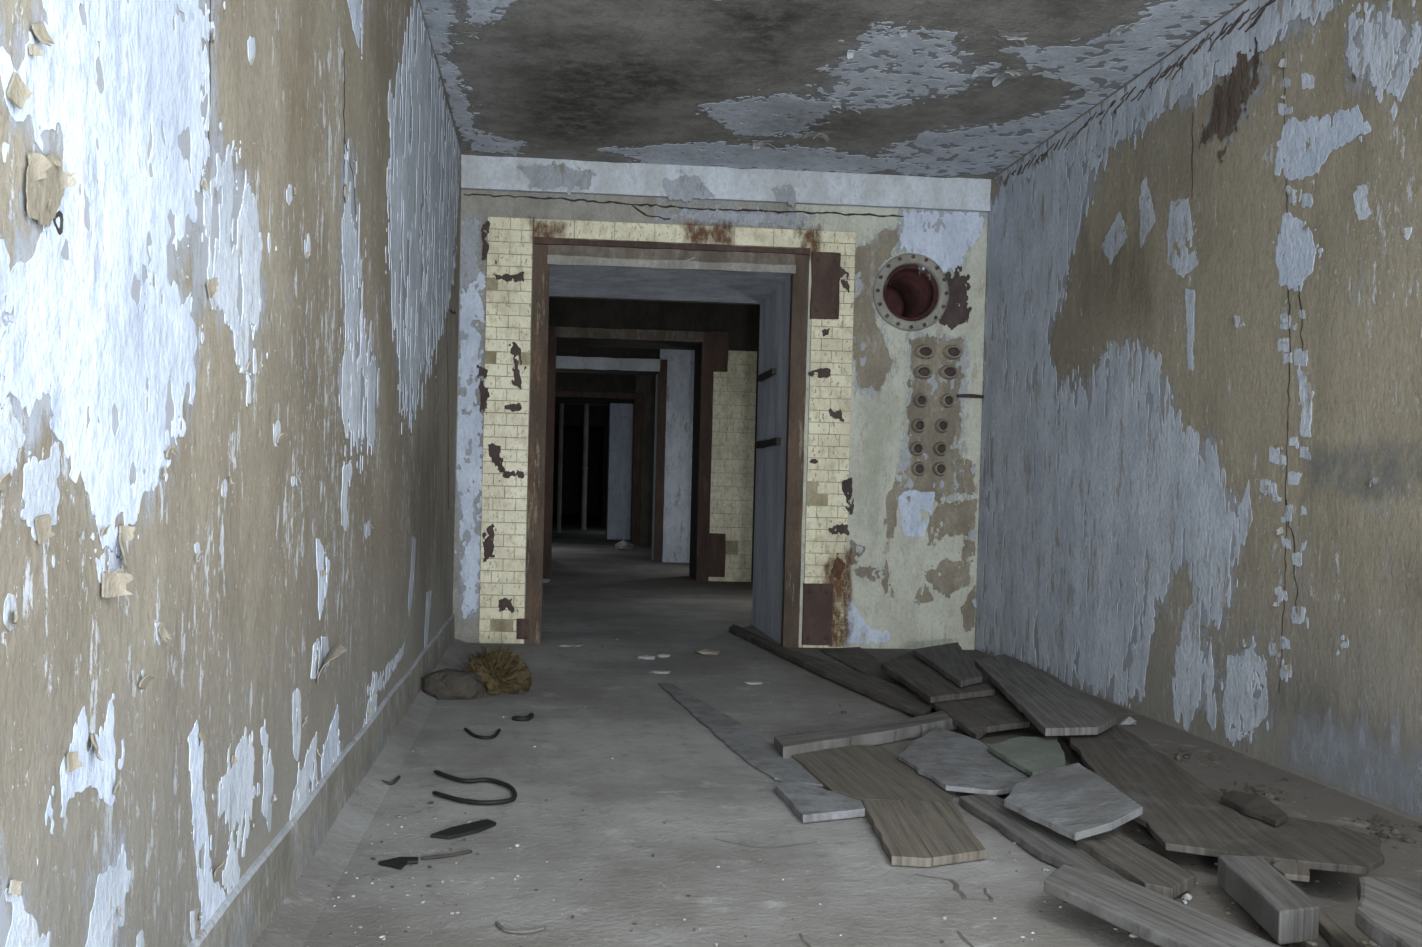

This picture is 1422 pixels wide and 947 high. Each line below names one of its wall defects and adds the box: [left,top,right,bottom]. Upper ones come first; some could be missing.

peeling [0,0,277,598]
peeling [339,0,597,619]
peeling [597,0,1422,746]
peeling [408,537,432,649]
corrosion [824,551,852,647]
peeling [45,693,125,834]
peeling [188,538,347,939]
peeling [0,880,61,947]
peeling [85,834,147,947]